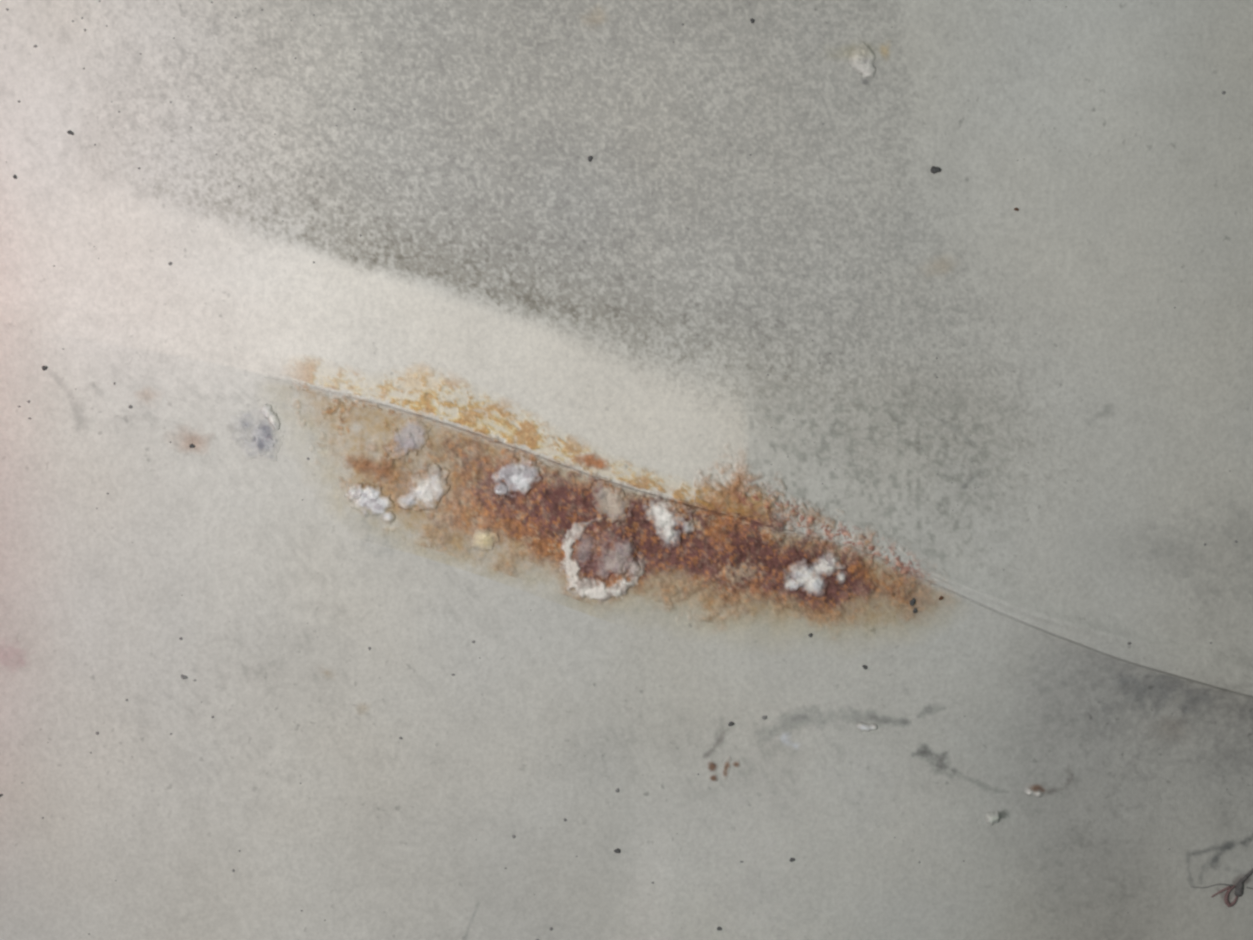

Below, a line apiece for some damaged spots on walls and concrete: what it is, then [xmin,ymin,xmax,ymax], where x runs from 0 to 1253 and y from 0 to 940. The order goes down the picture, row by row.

corrosion [253,353,976,660]